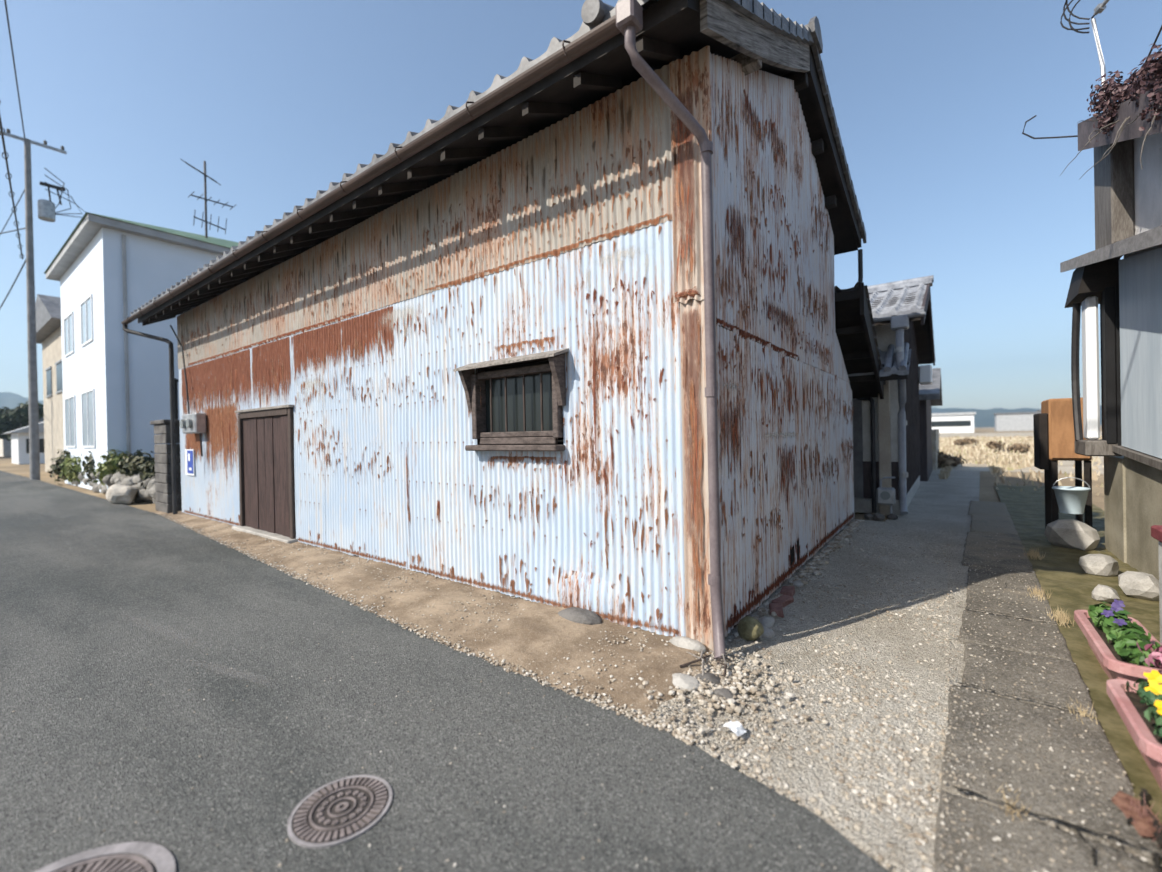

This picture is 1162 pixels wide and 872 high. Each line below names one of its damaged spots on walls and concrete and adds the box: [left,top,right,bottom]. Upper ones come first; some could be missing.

corrosion [181,90,703,637]
corrosion [715,89,854,542]
corrosion [726,512,854,631]